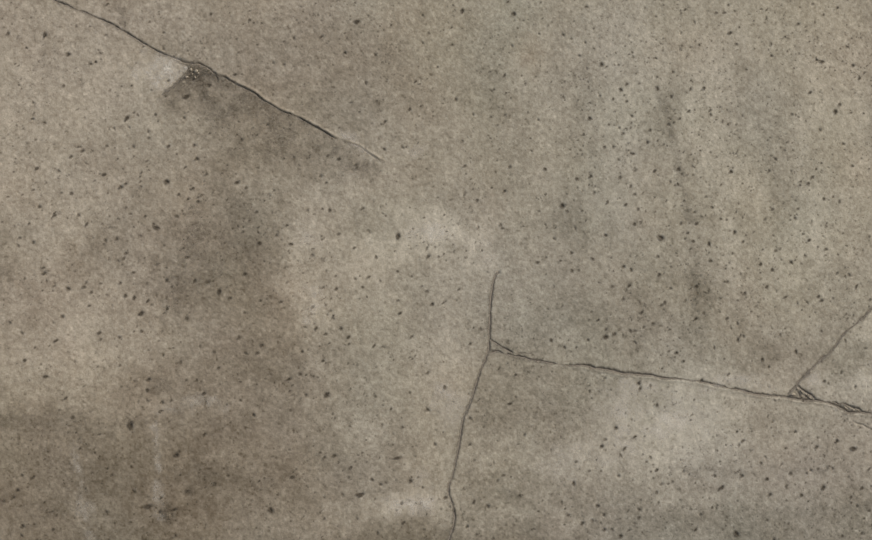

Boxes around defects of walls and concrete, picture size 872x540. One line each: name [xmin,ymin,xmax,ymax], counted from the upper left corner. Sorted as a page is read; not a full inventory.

crack [53,0,378,160]
crack [447,272,872,540]